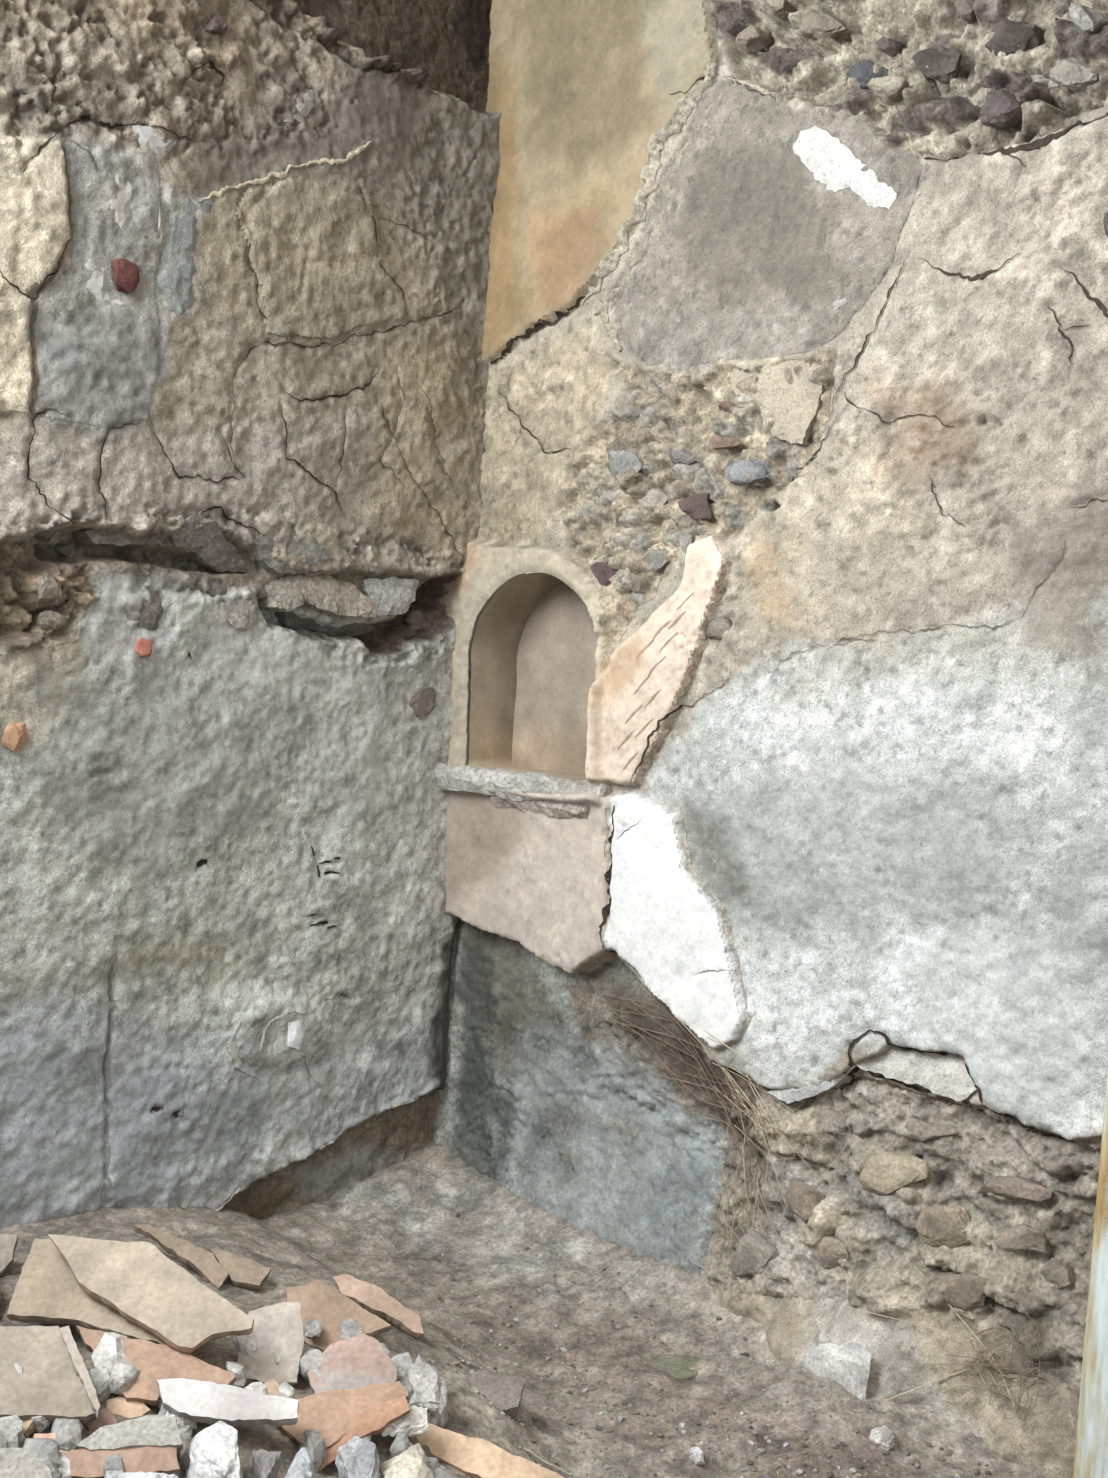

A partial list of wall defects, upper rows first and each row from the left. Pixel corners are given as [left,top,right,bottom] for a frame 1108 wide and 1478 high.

crack [23,60,207,172]
crack [0,242,68,300]
crack [27,169,465,565]
crack [491,296,586,455]
flaking render [560,0,1108,645]
crack [778,251,1022,491]
crack [1048,269,1108,384]
peeling [134,590,164,658]
peeling [72,516,419,637]
crack [772,498,1108,672]
crack [840,1029,1069,1141]
flaking render [707,1076,1101,1425]